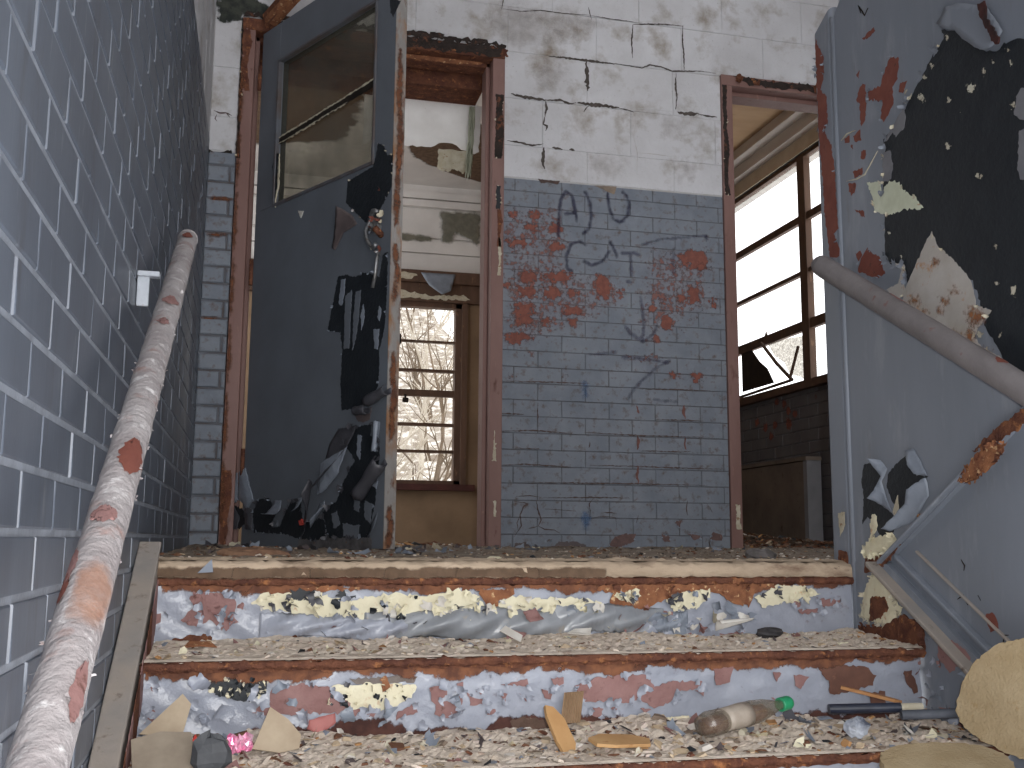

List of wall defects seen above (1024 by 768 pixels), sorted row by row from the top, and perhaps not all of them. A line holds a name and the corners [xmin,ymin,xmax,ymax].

crack [501,0,634,22]
rust [236,10,263,179]
rust [393,30,508,226]
peeling [812,1,1024,372]
peeling [495,185,717,362]
rust [389,352,398,440]
rust [957,409,1024,485]
peeling [861,448,929,537]
peeling [181,588,605,648]
rust [123,514,926,768]
peeling [608,584,842,636]
peeling [186,667,734,741]